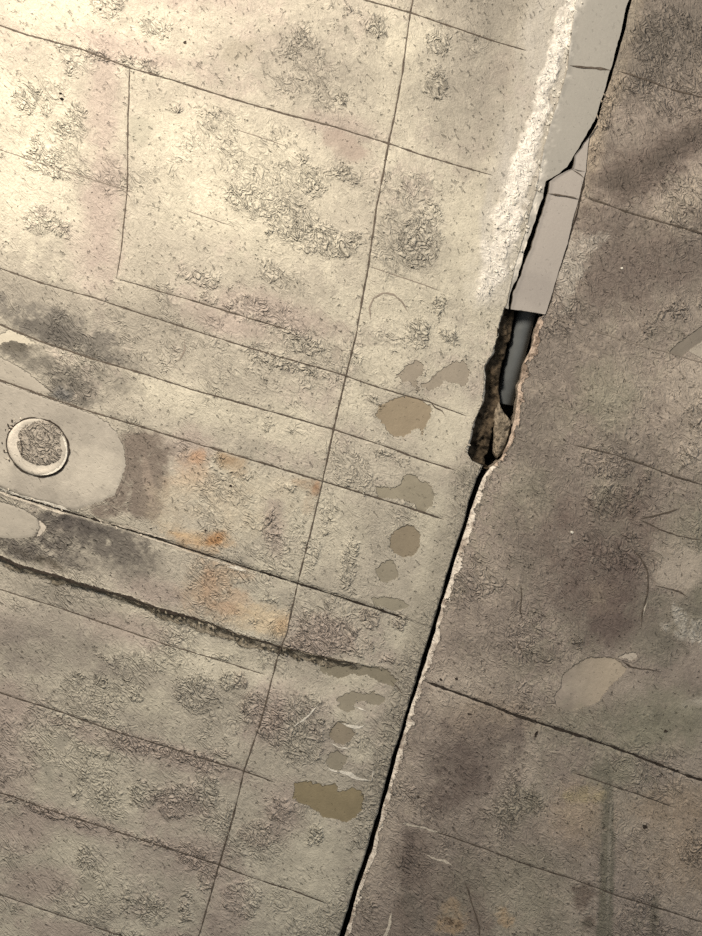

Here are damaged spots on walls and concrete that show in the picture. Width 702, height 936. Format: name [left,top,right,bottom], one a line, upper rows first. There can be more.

leakage [0,284,194,596]
crack [0,555,359,665]
crack [0,477,409,620]
peeling [0,293,546,936]
crack [369,292,408,320]
leakage [457,0,583,320]
crack [339,468,702,936]
crack [518,0,630,311]